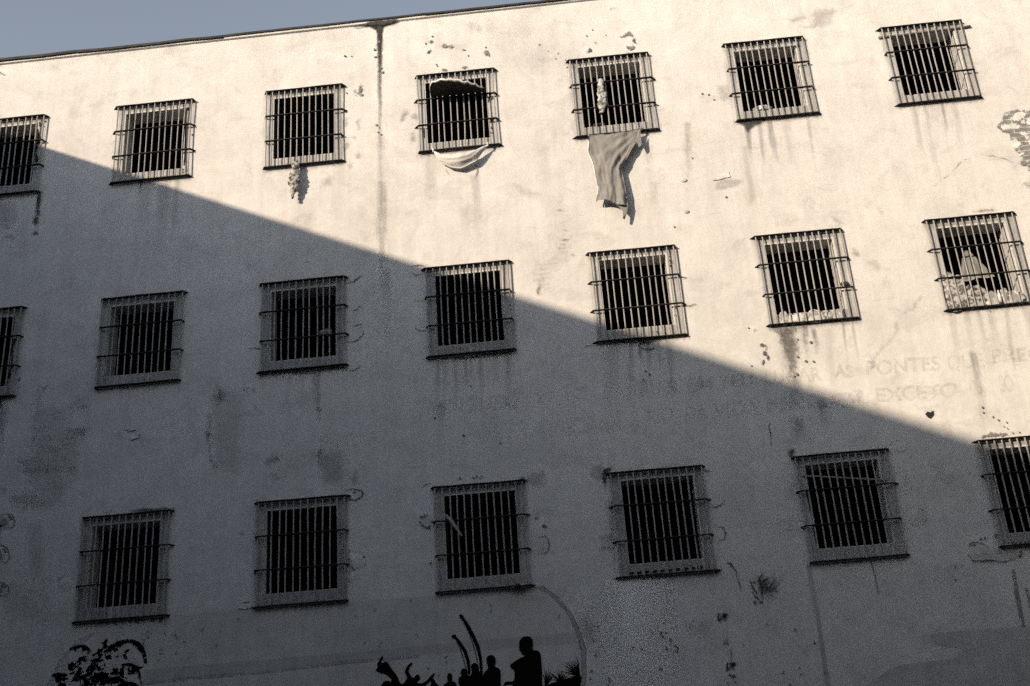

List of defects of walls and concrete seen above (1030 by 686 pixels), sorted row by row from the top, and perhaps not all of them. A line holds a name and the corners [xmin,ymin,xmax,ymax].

water stain [355,19,397,83]
spalling [997,109,1030,170]